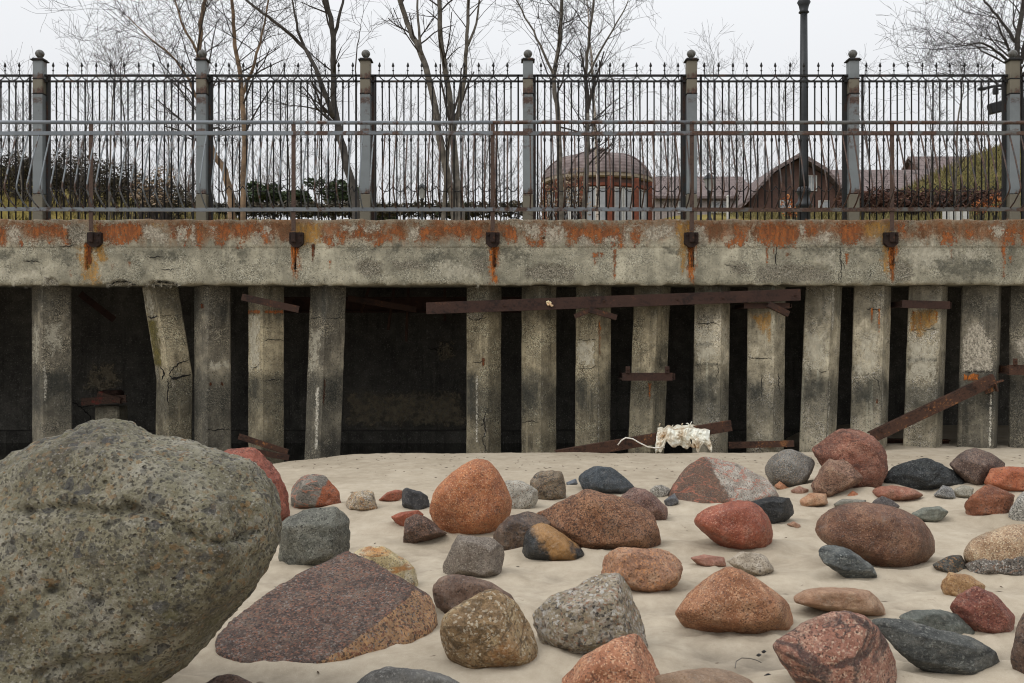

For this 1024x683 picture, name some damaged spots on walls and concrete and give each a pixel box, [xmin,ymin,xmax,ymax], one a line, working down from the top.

rust [70,244,113,284]
rust [291,220,514,283]
rust [676,219,1024,282]